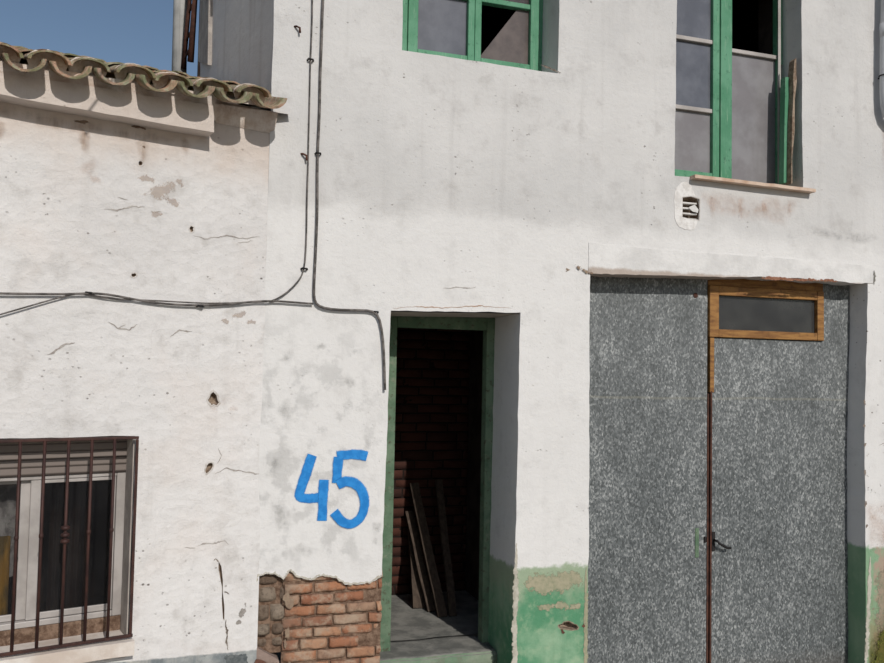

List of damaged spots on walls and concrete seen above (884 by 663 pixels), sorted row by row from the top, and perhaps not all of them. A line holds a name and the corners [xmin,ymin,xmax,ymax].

flaking render [206,390,221,407]
crack [217,449,258,475]
peeling [526,571,585,634]
flaking render [257,569,383,663]
peeling [224,654,248,663]